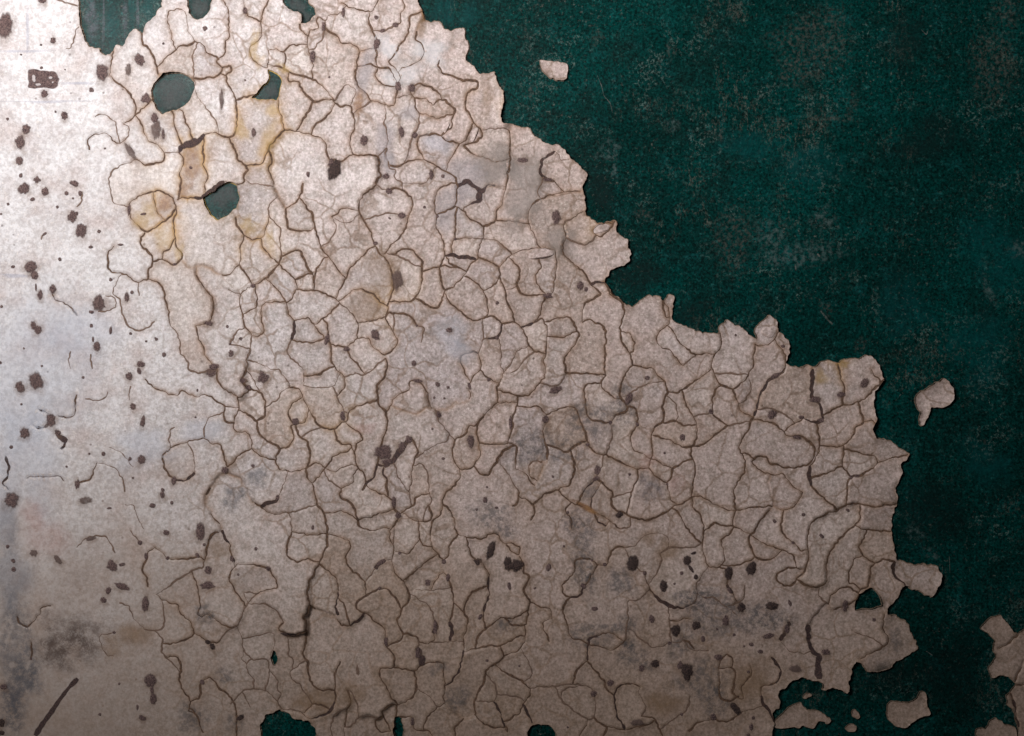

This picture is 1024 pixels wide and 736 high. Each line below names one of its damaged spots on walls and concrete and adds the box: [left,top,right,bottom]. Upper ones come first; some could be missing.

peeling [78,0,162,55]
peeling [187,0,212,20]
peeling [282,0,316,23]
peeling [152,72,195,114]
peeling [252,69,282,100]
peeling [203,182,240,220]
crack [95,0,908,736]
peeling [418,0,1024,736]
crack [79,447,143,541]
peeling [260,709,317,736]